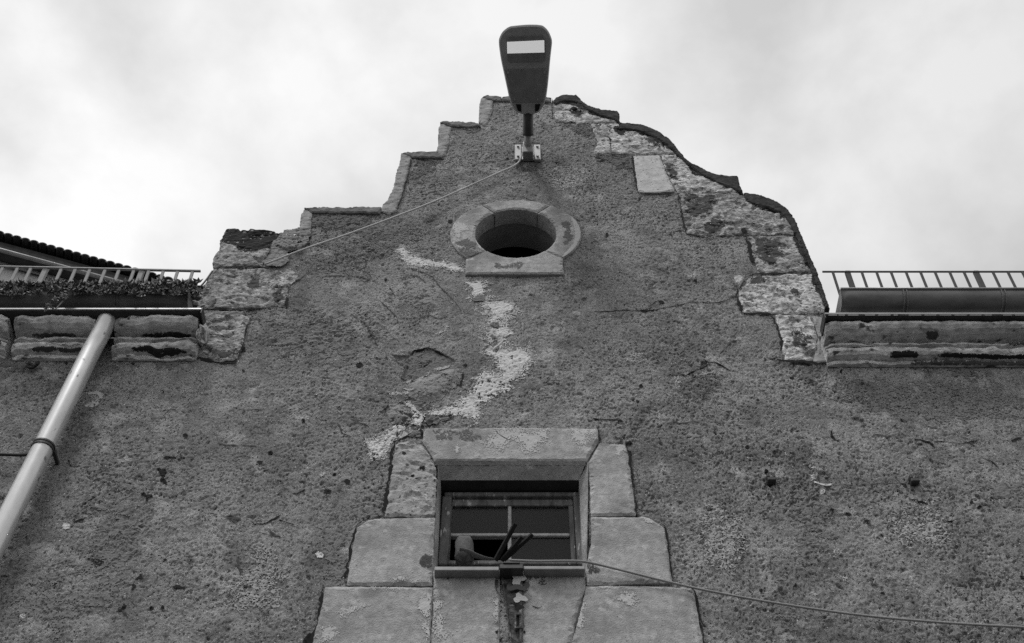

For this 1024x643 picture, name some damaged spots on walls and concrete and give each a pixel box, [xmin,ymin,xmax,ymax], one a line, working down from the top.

spalling [703,218,725,233]
spalling [264,228,311,267]
crack [583,126,843,376]
peeling [359,244,537,467]
leakage [433,428,482,441]